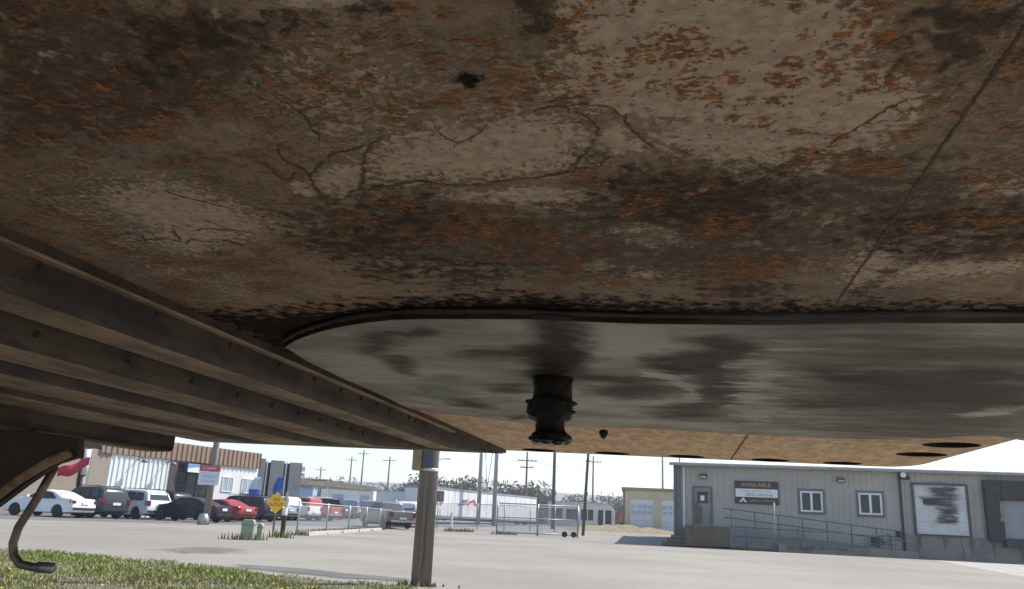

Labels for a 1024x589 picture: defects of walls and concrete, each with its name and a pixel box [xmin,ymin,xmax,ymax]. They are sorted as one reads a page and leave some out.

crack [113,85,655,248]
peeling [204,0,959,209]
water stain [192,193,1024,358]
peeling [576,258,671,280]
corrosion [260,0,999,175]
peeling [597,218,704,251]
crack [828,99,908,148]
water stain [582,337,804,428]